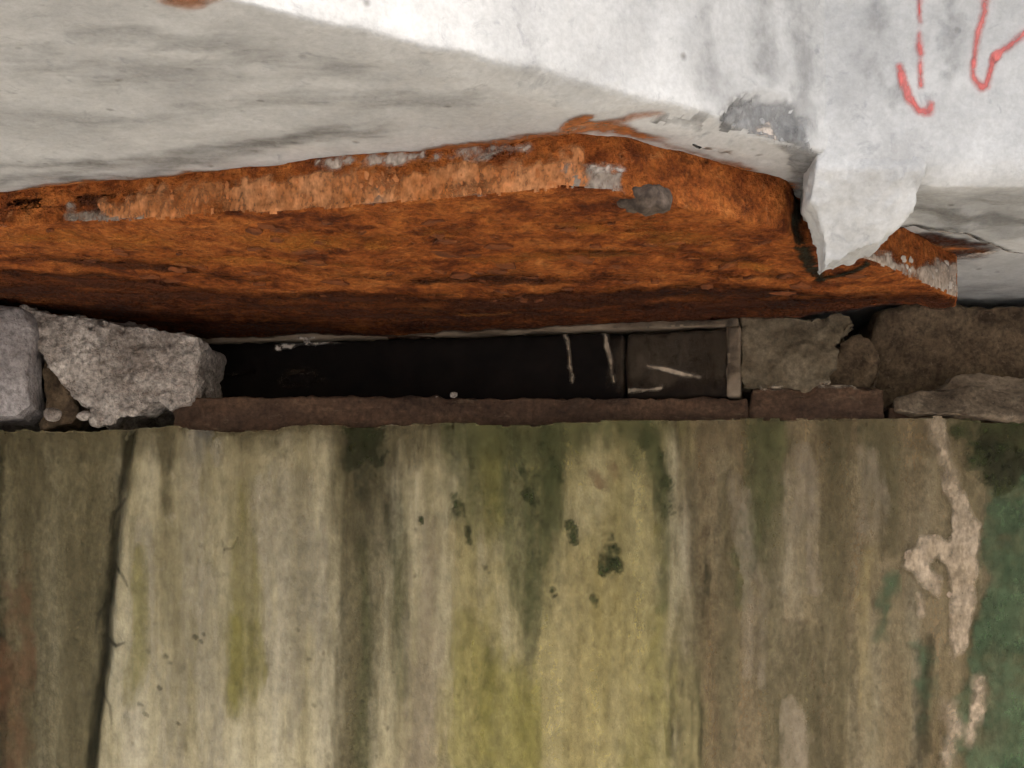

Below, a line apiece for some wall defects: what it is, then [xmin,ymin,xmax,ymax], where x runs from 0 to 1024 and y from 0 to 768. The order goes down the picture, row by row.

rust [97,114,657,269]
rust [0,219,997,340]
water stain [0,425,219,768]
crack [89,430,134,768]
water stain [324,423,424,768]
water stain [657,418,1024,768]